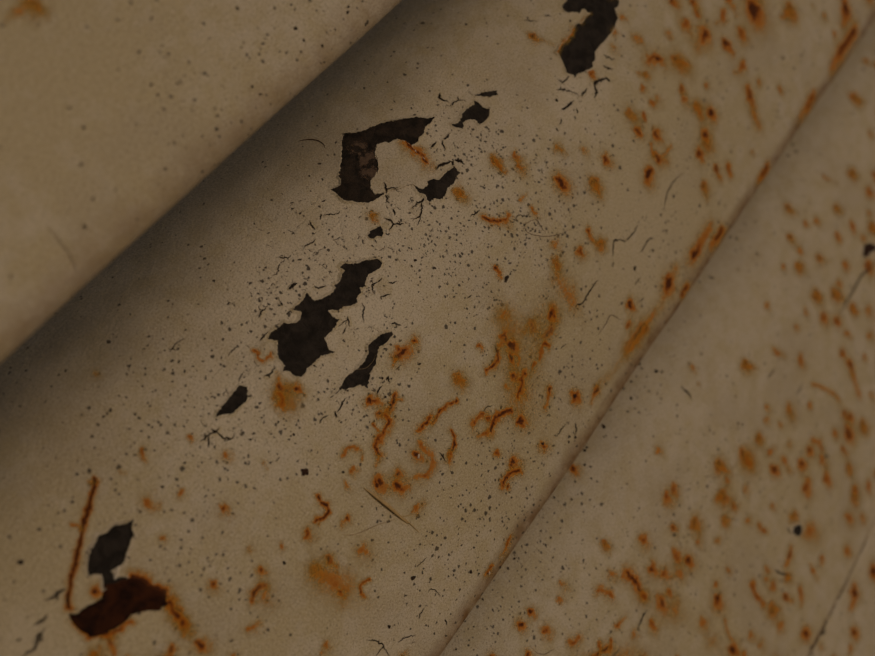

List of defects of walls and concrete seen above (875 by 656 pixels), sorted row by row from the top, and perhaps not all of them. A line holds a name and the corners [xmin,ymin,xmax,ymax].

peeling [553,0,621,80]
corrosion [669,0,767,74]
peeling [327,90,499,206]
corrosion [625,52,732,188]
peeling [213,383,257,420]
peeling [265,256,384,379]
peeling [327,330,395,401]
corrosion [365,372,467,496]
corrosion [64,476,99,611]
peeling [68,517,168,637]
corrosion [128,569,212,656]
corrosion [595,547,695,633]